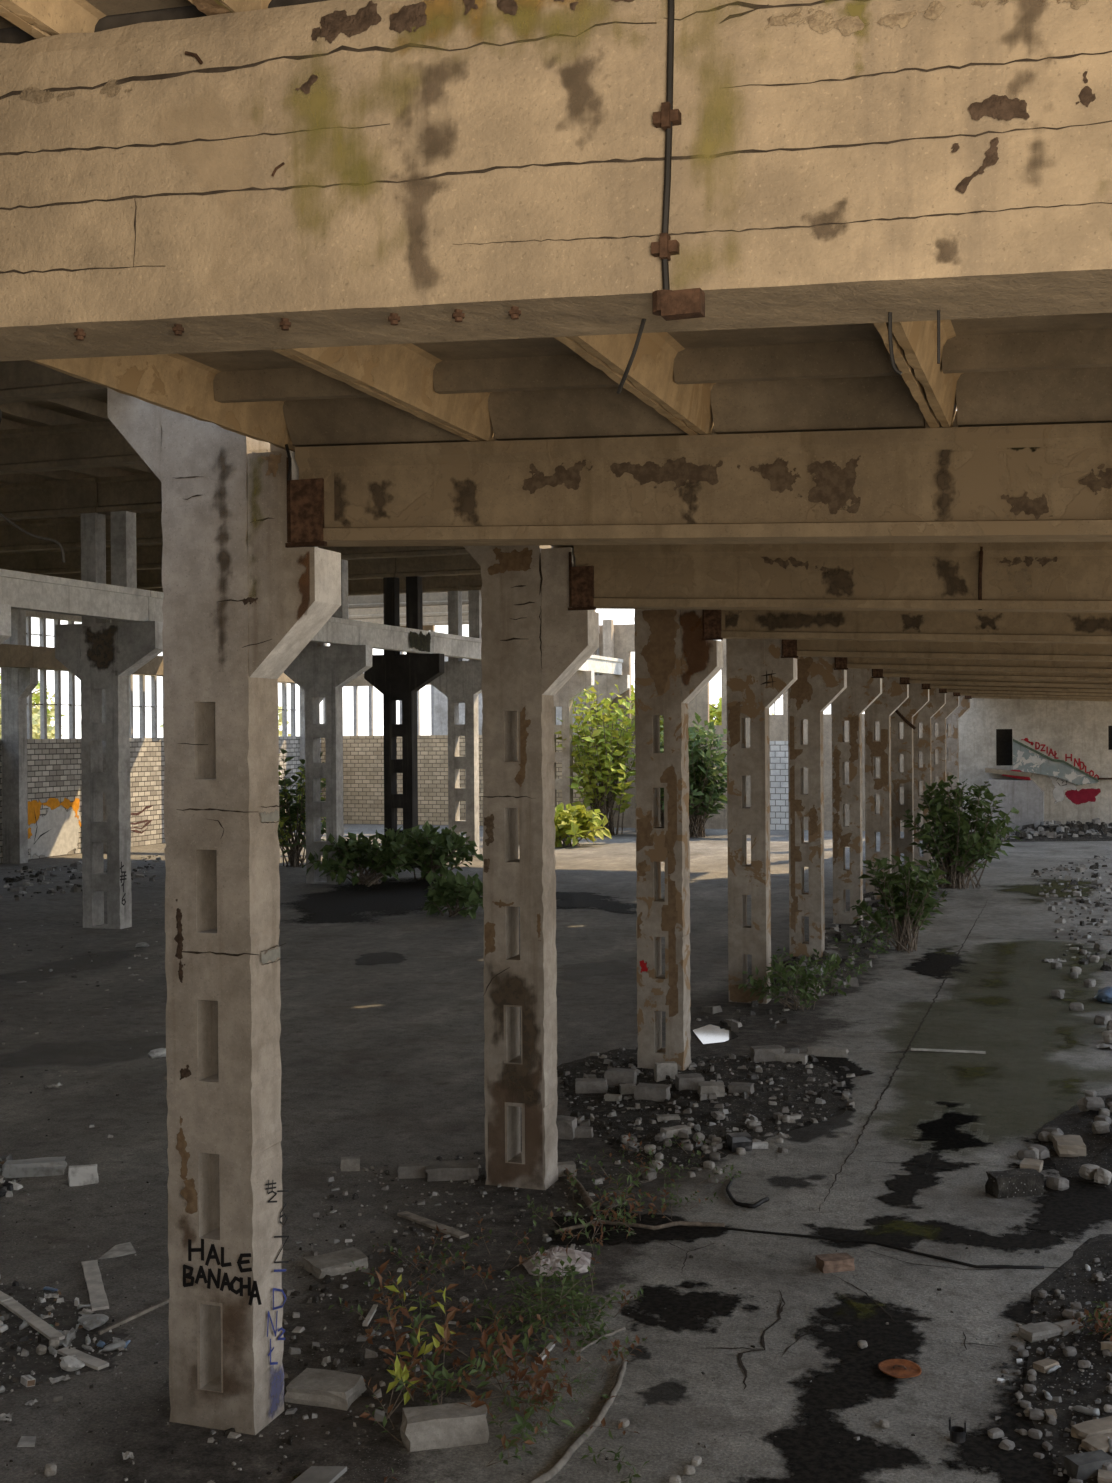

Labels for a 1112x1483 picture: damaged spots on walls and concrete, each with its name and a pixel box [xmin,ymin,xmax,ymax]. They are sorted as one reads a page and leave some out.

water stain [292,71,372,197]
spalling [311,1,427,44]
crack [0,0,869,100]
water stain [561,60,601,124]
crack [727,51,1112,88]
water stain [406,174,439,285]
crack [0,120,1112,274]
peeling [518,456,861,514]
peeling [790,657,888,945]
peeling [636,766,678,1017]
water stain [804,1101,1112,1255]
crack [720,1290,813,1389]